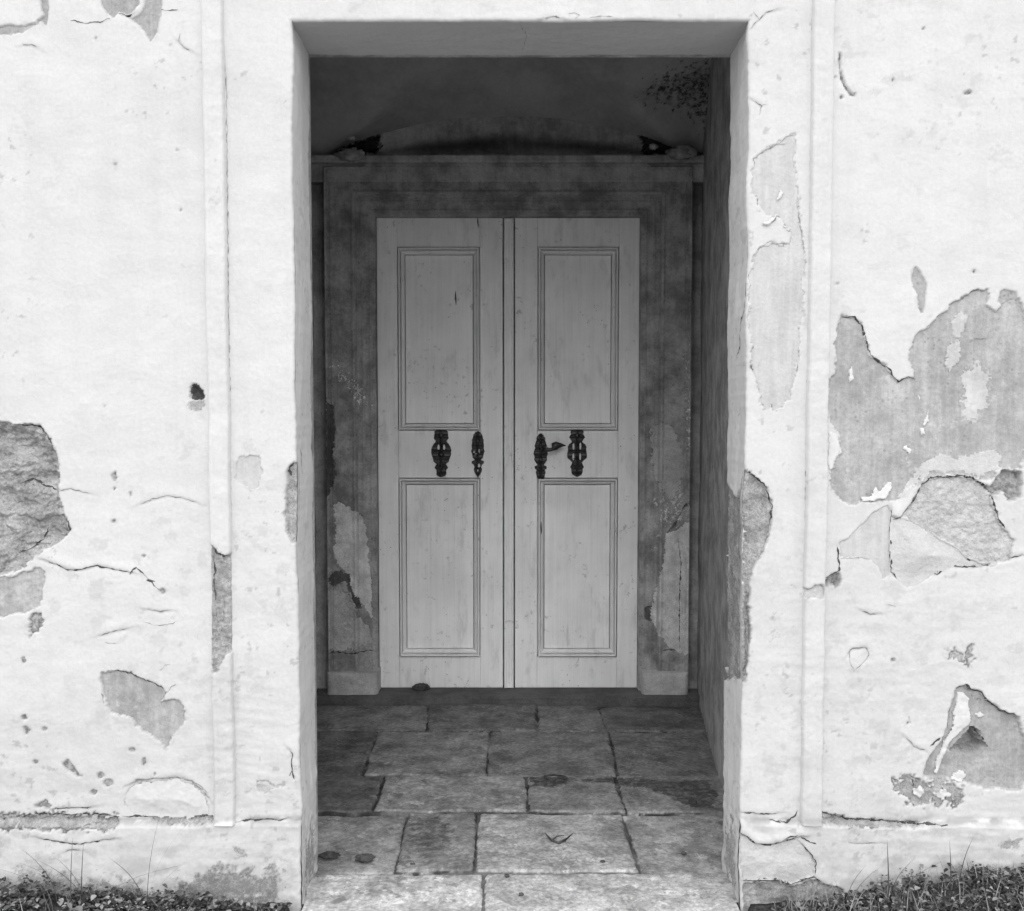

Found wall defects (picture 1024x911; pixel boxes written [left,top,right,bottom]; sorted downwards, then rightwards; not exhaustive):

damp [642,60,709,134]
spalling [191,383,205,400]
flaking render [828,289,1024,564]
flaking render [0,422,70,633]
crack [48,561,175,644]
spalling [211,547,233,672]
peeling [326,398,375,652]
peeling [645,423,690,655]
spalling [727,471,773,679]
flaking render [101,670,185,746]
flaking render [891,684,1024,808]
crack [739,812,821,885]